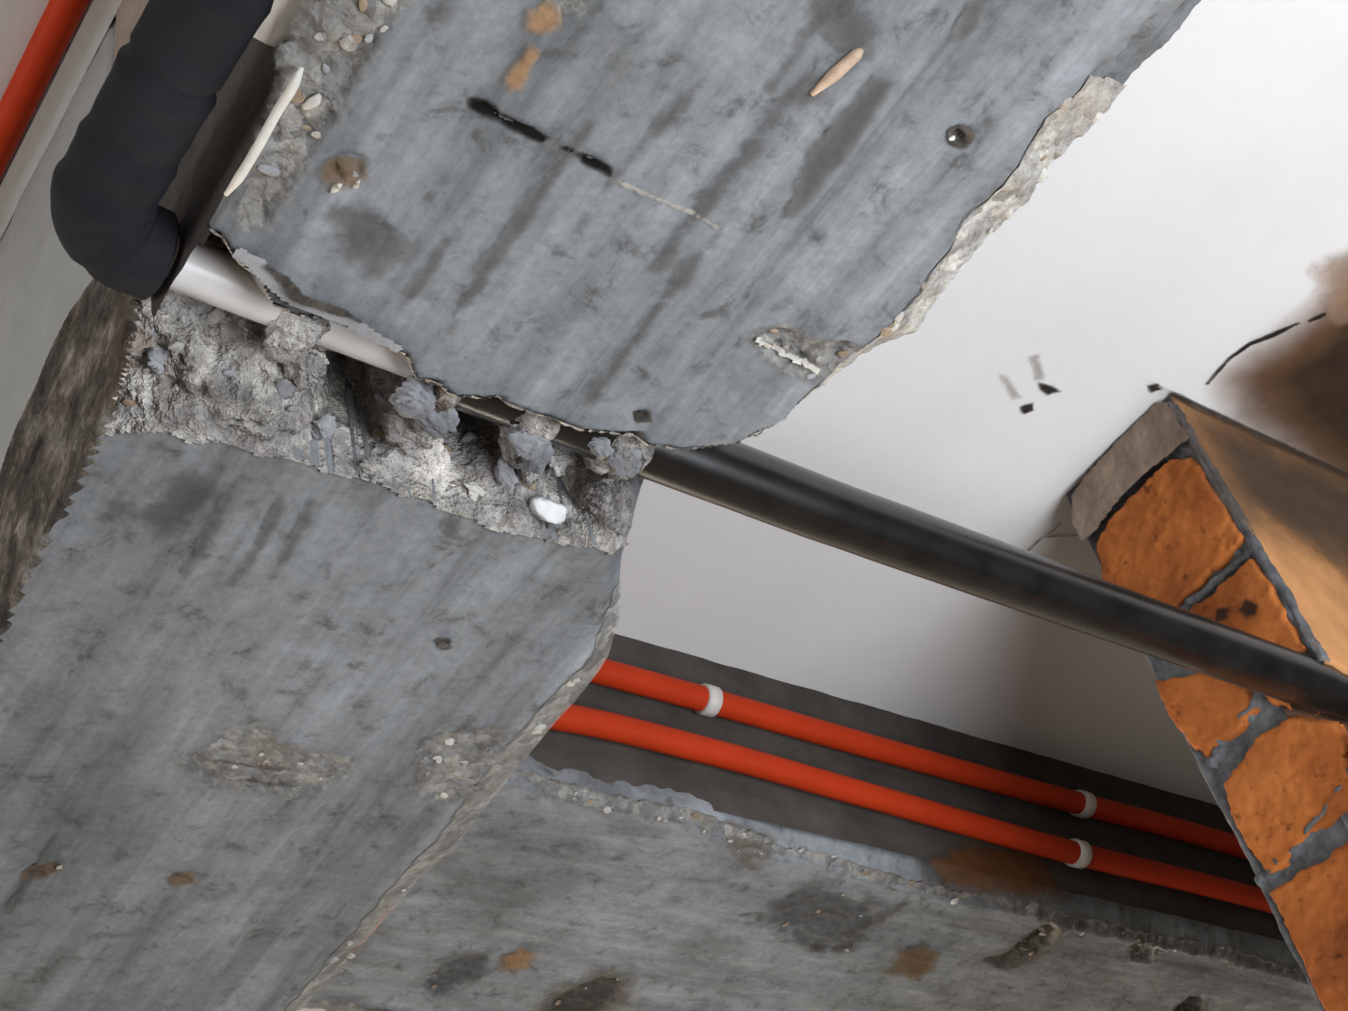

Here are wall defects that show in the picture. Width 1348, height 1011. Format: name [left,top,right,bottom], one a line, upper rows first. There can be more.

flaking render [114,0,149,61]
rust [528,3,561,33]
rust [507,49,538,89]
spalling [224,0,411,231]
crack [562,146,582,158]
crack [621,182,717,229]
spalling [0,75,1127,643]
crack [1169,313,1348,477]
water stain [1232,259,1348,474]
spalling [177,723,358,799]
spalling [286,581,1298,1011]